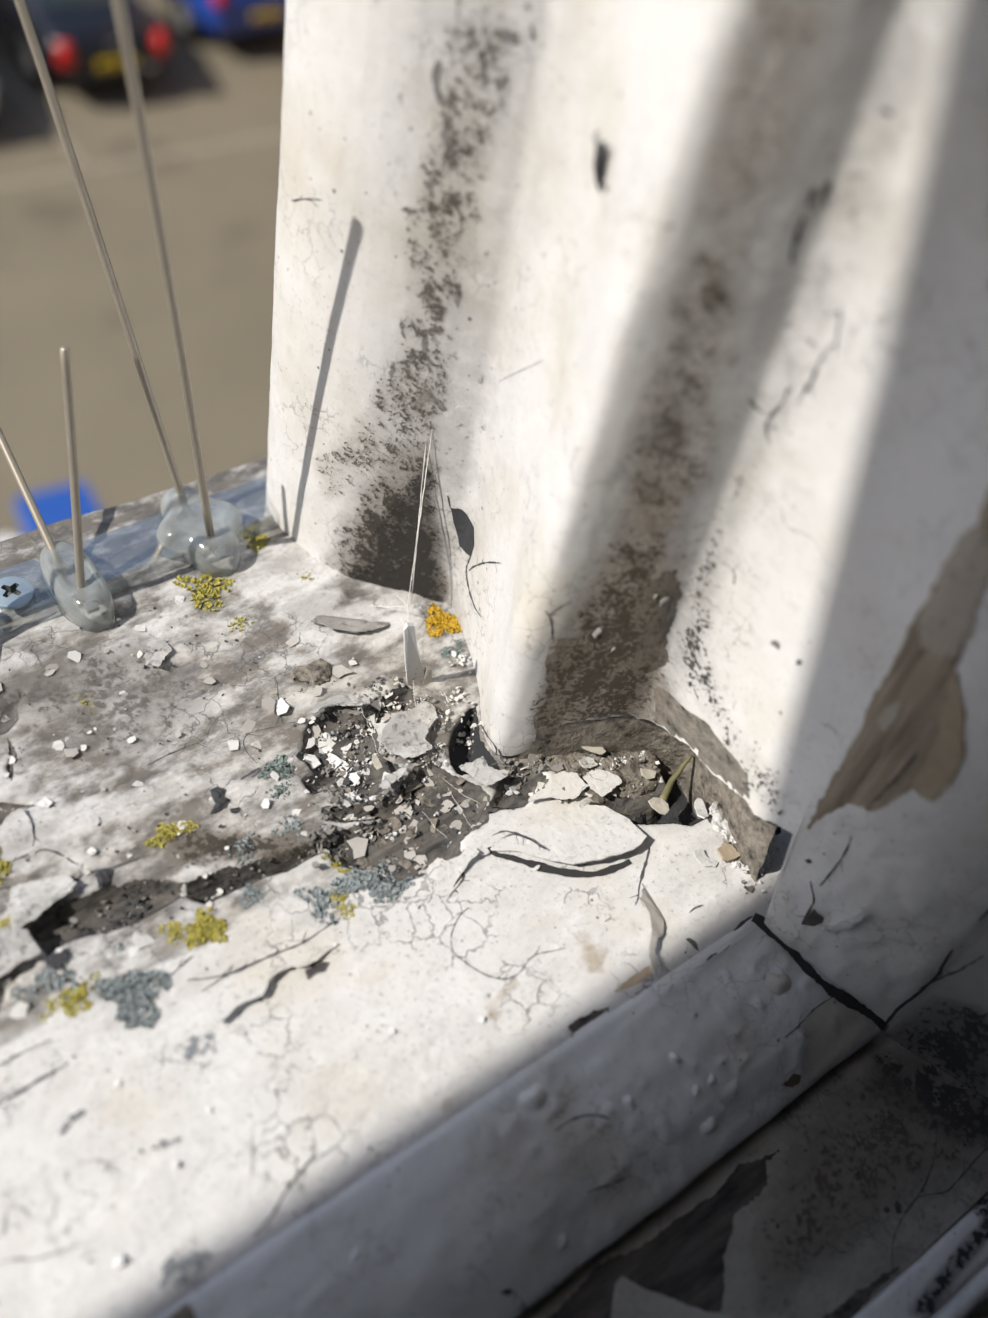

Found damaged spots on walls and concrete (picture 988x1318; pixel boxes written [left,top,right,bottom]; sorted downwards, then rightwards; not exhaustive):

damp [316,4,512,602]
damp [530,248,738,743]
peeling [372,701,438,789]
peeling [419,746,647,890]
peeling [0,874,77,977]
crack [170,949,286,981]
crack [444,847,650,980]
crack [701,836,984,1030]
damp [903,1002,988,1090]
crack [254,1153,316,1237]
peeling [549,1150,780,1318]
damp [915,1192,988,1314]